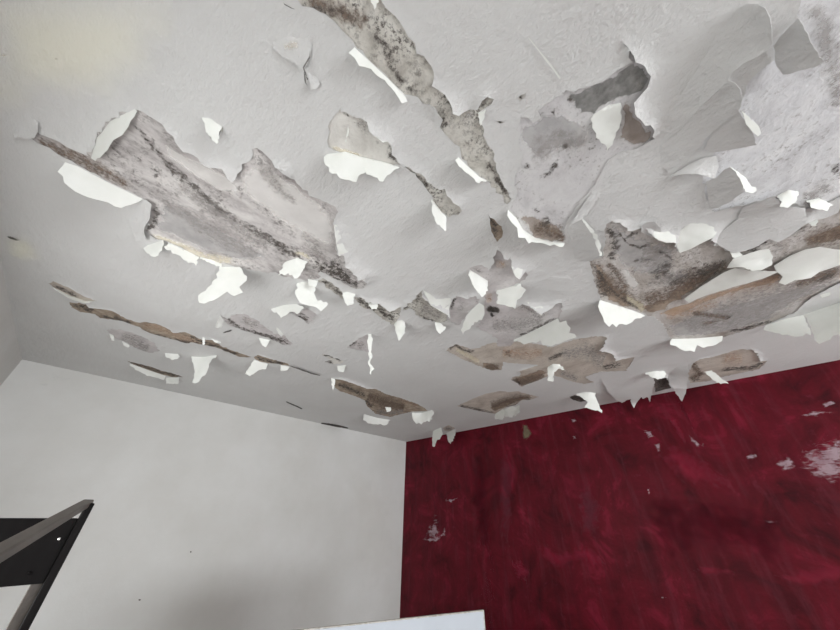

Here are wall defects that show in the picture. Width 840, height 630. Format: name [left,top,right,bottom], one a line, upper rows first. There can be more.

peeling [323,354,456,447]
peeling [13,0,840,420]